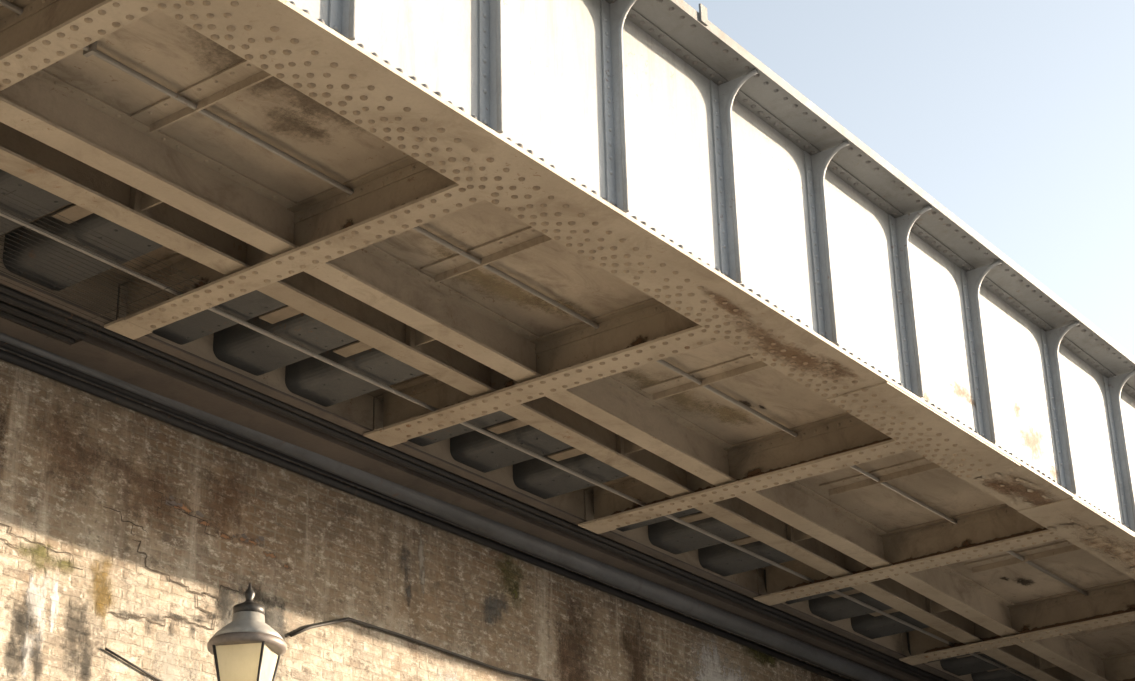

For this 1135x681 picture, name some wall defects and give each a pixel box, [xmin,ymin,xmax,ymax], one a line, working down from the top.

corrosion [752,327,852,378]
corrosion [963,468,1051,510]
crack [0,523,83,570]
crack [103,480,240,619]
corrosion [891,528,1048,565]
corrosion [781,576,834,591]
water stain [7,561,112,681]
water stain [219,590,245,627]
water stain [265,605,284,628]
corrosion [1018,605,1135,634]
water stain [622,622,649,681]
corrosion [924,643,966,653]